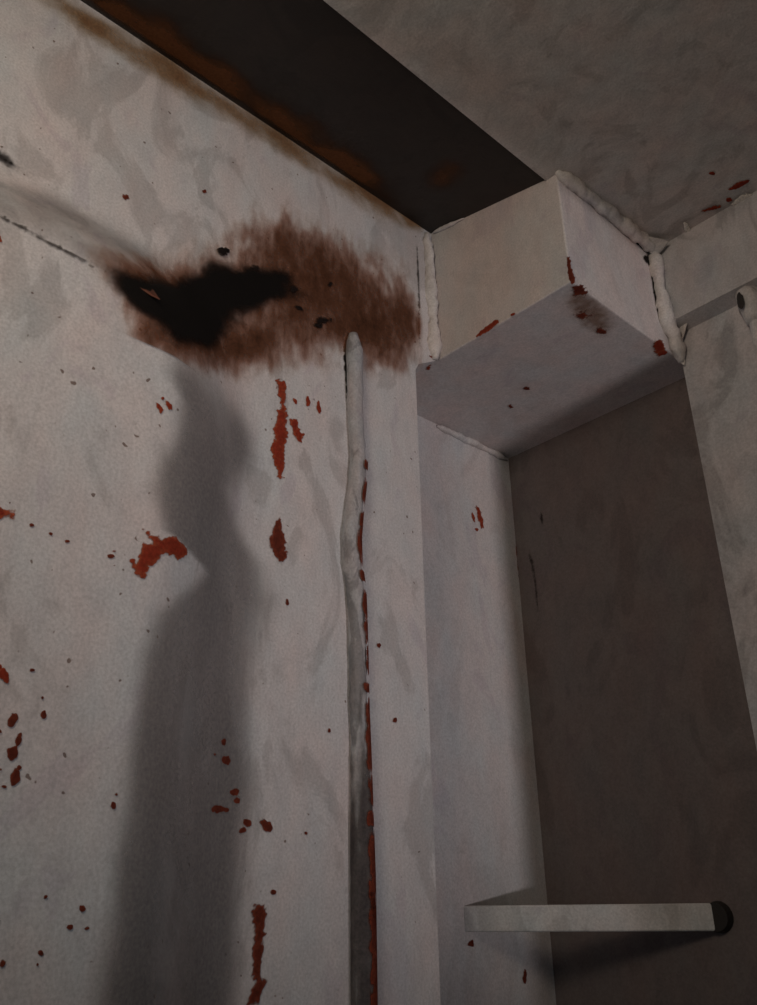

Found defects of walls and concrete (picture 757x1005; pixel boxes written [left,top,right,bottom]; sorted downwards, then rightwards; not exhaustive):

rust [476,320,499,337]
rust [567,257,606,334]
rust [653,339,667,357]
rust [270,379,321,479]
rust [0,502,15,519]
rust [130,529,188,579]
rust [0,664,9,683]
rust [0,713,22,788]
rust [357,459,381,1005]
rust [247,904,267,1005]